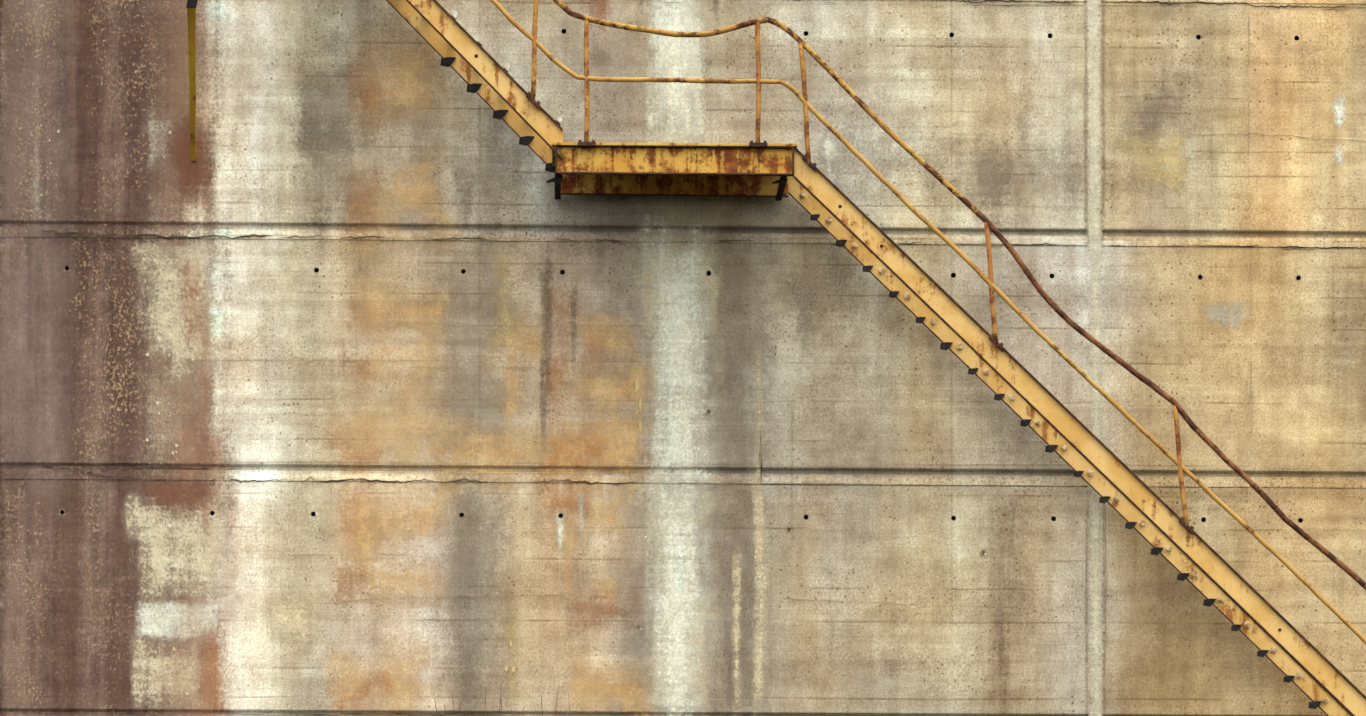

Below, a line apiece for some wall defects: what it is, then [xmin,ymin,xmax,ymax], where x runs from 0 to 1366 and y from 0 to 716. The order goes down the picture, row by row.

crack [783,0,1074,8]
crack [1109,1,1366,201]
rust [167,119,214,193]
crack [40,228,781,244]
crack [957,243,1365,451]
rust [446,368,646,487]
crack [2,465,644,485]